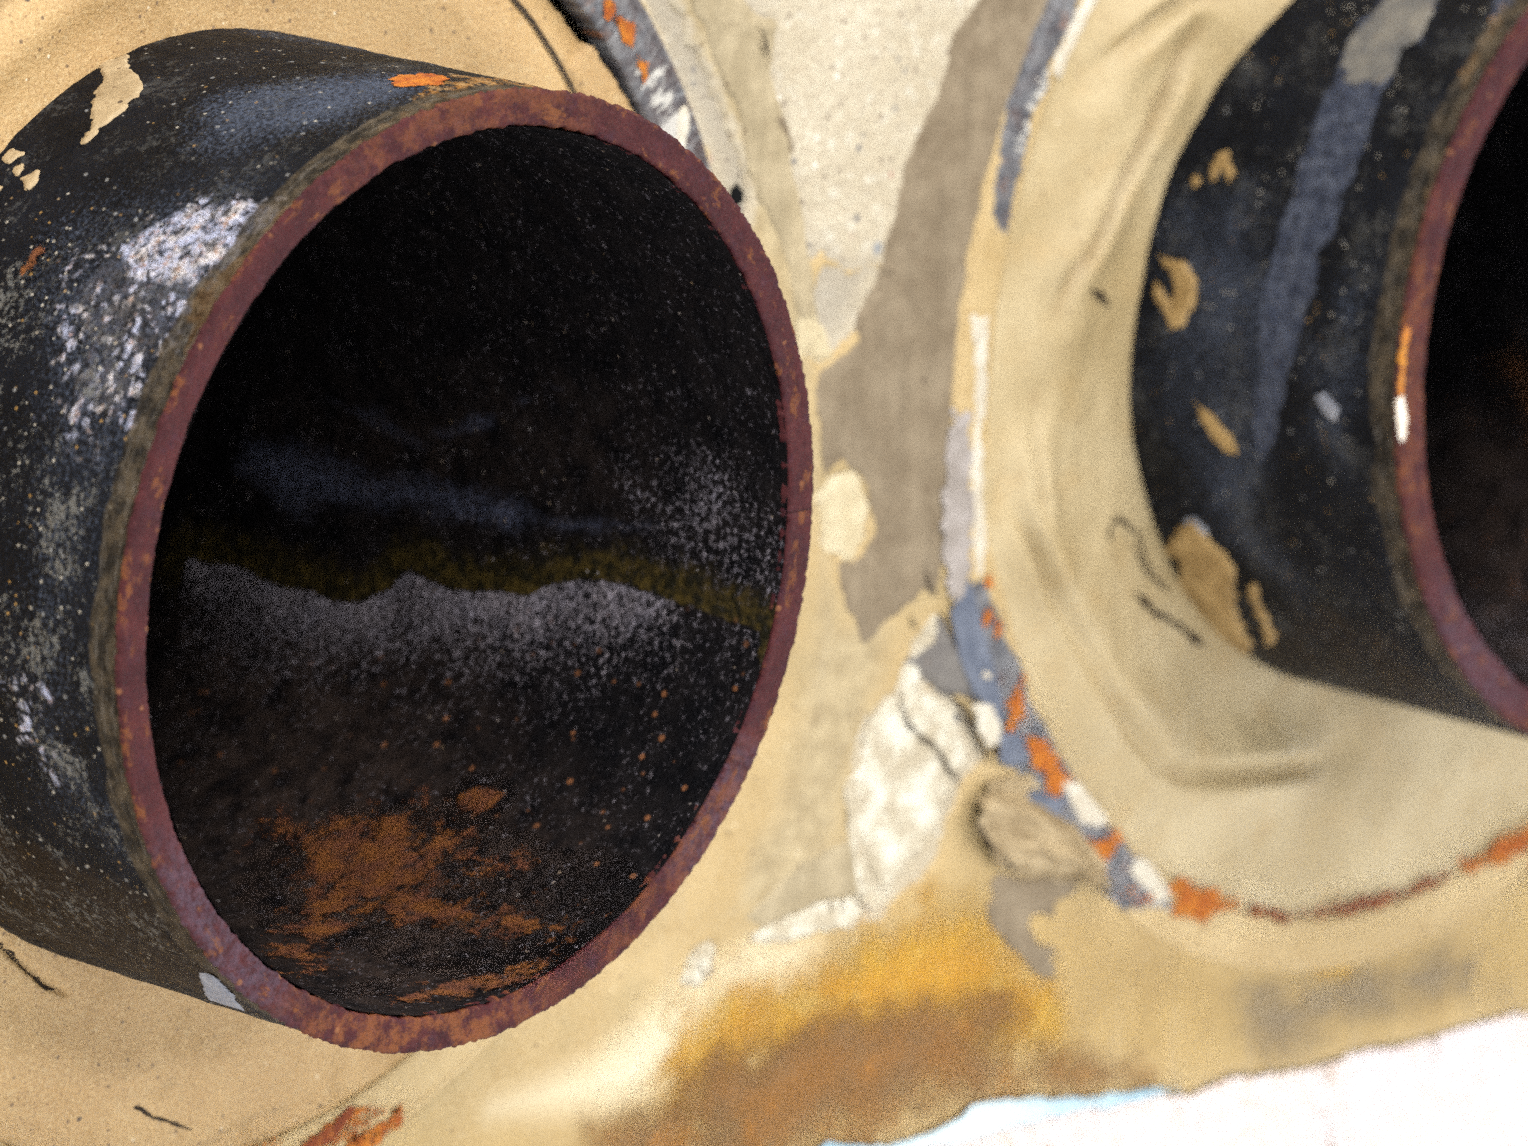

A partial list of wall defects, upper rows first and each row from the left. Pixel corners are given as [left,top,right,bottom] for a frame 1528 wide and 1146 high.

peeling [1052,0,1097,80]
peeling [80,54,143,144]
peeling [0,148,40,191]
spalling [749,313,1113,980]
crack [900,562,1003,785]
corrosion [237,785,580,1005]
crack [977,820,1019,873]
corrosion [1087,828,1125,875]
peeling [1130,858,1172,905]
corrosion [1123,826,1528,926]
spalling [678,941,714,989]
corrosion [302,1104,404,1146]